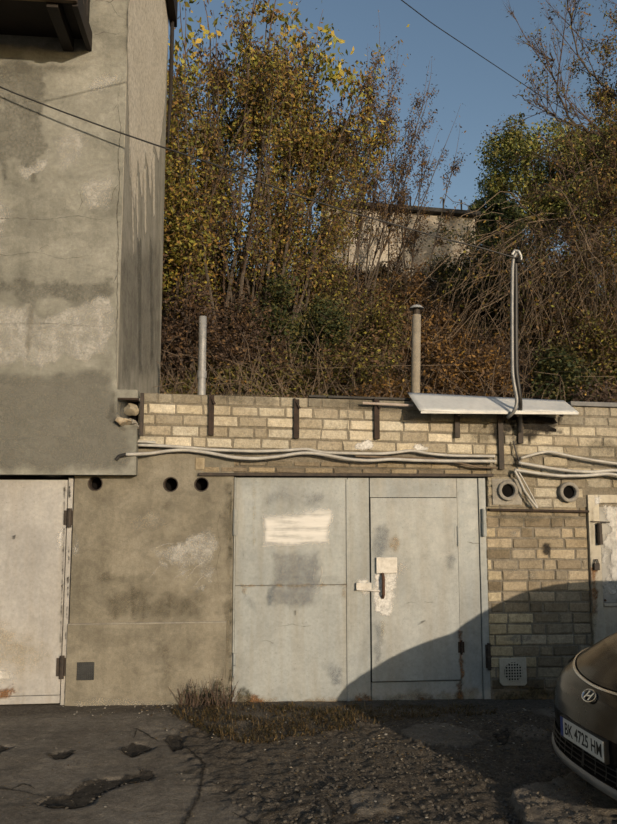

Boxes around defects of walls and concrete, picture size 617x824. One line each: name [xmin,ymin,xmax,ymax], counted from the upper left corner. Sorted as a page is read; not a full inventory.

damp [0,280,113,364]
peeling [594,496,617,594]